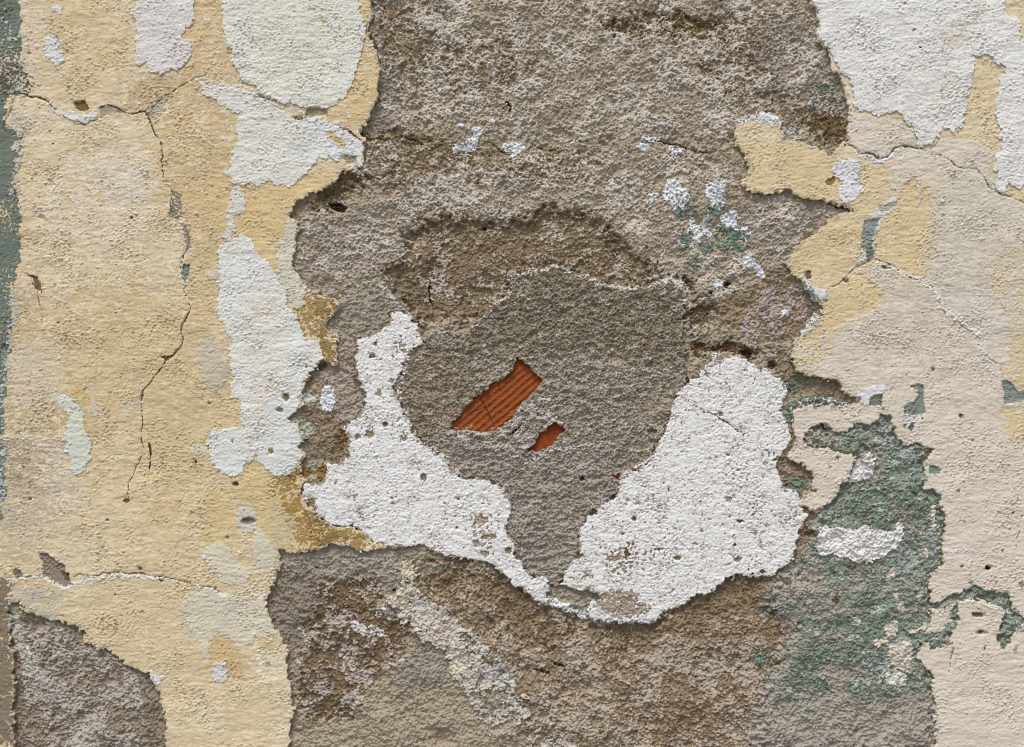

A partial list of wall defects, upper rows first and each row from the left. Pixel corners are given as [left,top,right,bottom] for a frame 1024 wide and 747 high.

spalling [9,601,168,747]
crack [3,40,218,498]
crack [73,572,220,592]
spalling [266,0,1024,747]